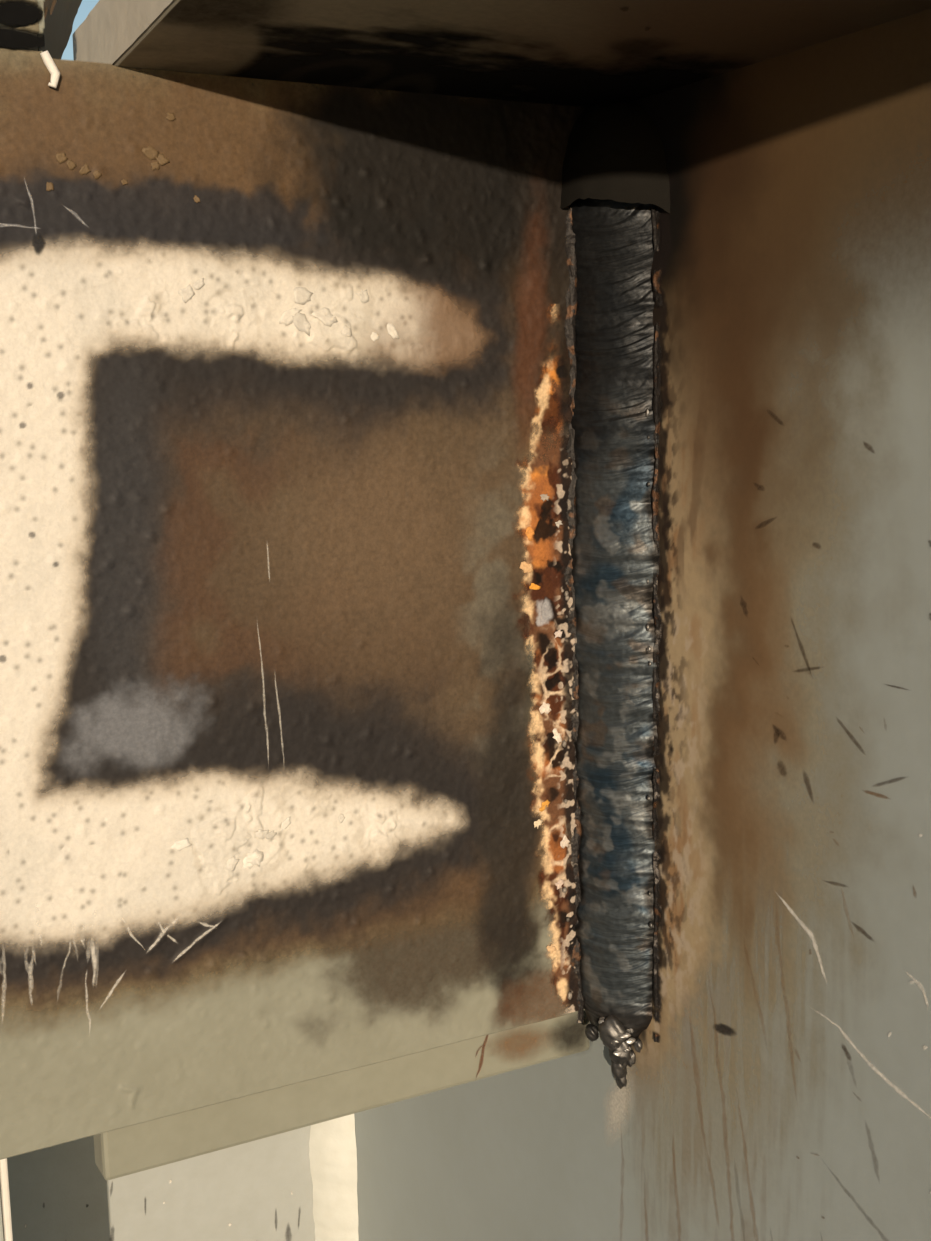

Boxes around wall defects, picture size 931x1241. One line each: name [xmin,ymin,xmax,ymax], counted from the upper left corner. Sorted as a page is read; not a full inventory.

corrosion [515,340,579,1013]